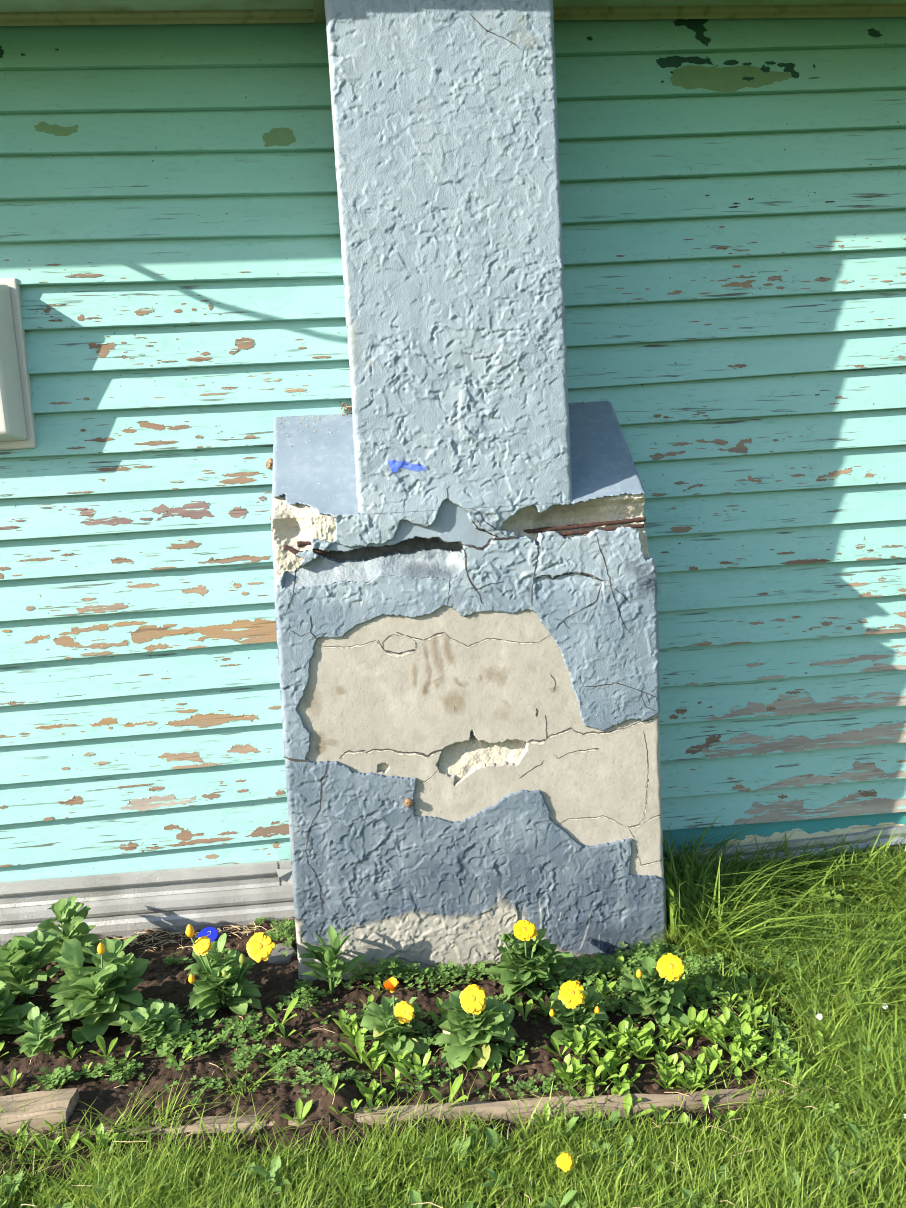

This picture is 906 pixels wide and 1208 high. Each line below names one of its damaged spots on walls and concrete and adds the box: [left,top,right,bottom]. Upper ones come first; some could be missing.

peeling [118,295,223,323]
peeling [87,334,312,396]
flaking render [0,397,710,666]
crack [286,488,630,657]
corrosion [524,517,646,536]
peeling [0,700,281,743]
peeling [116,743,272,811]
crack [520,674,663,867]
spalling [297,606,906,879]
peeling [119,820,289,862]
crack [284,749,442,921]
peeling [295,895,526,981]